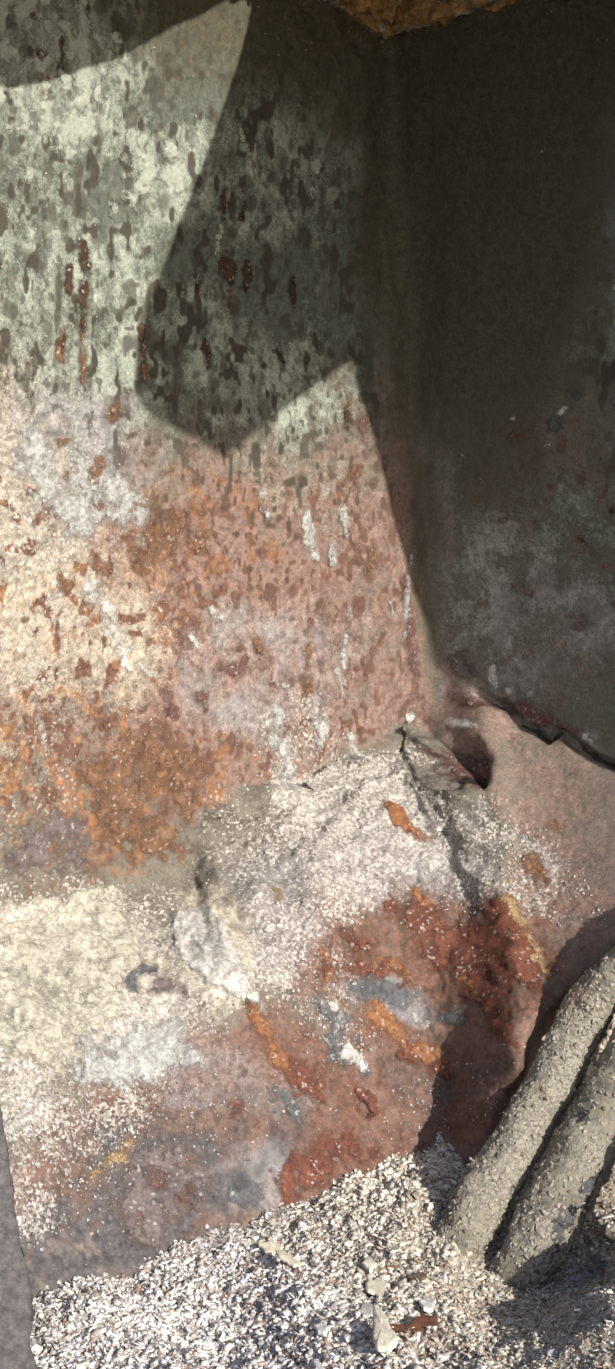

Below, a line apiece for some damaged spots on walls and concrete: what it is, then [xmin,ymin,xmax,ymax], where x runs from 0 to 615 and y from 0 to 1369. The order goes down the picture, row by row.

rust [341,0,517,37]
rust [55,239,92,384]
rust [58,571,76,596]
water stain [447,650,595,742]
crack [476,672,615,769]
rust [5,720,211,877]
rust [384,801,435,843]
peeling [459,777,487,787]
rust [319,887,556,1053]
rust [245,998,326,1103]
rust [364,999,449,1081]
rust [271,1133,380,1207]